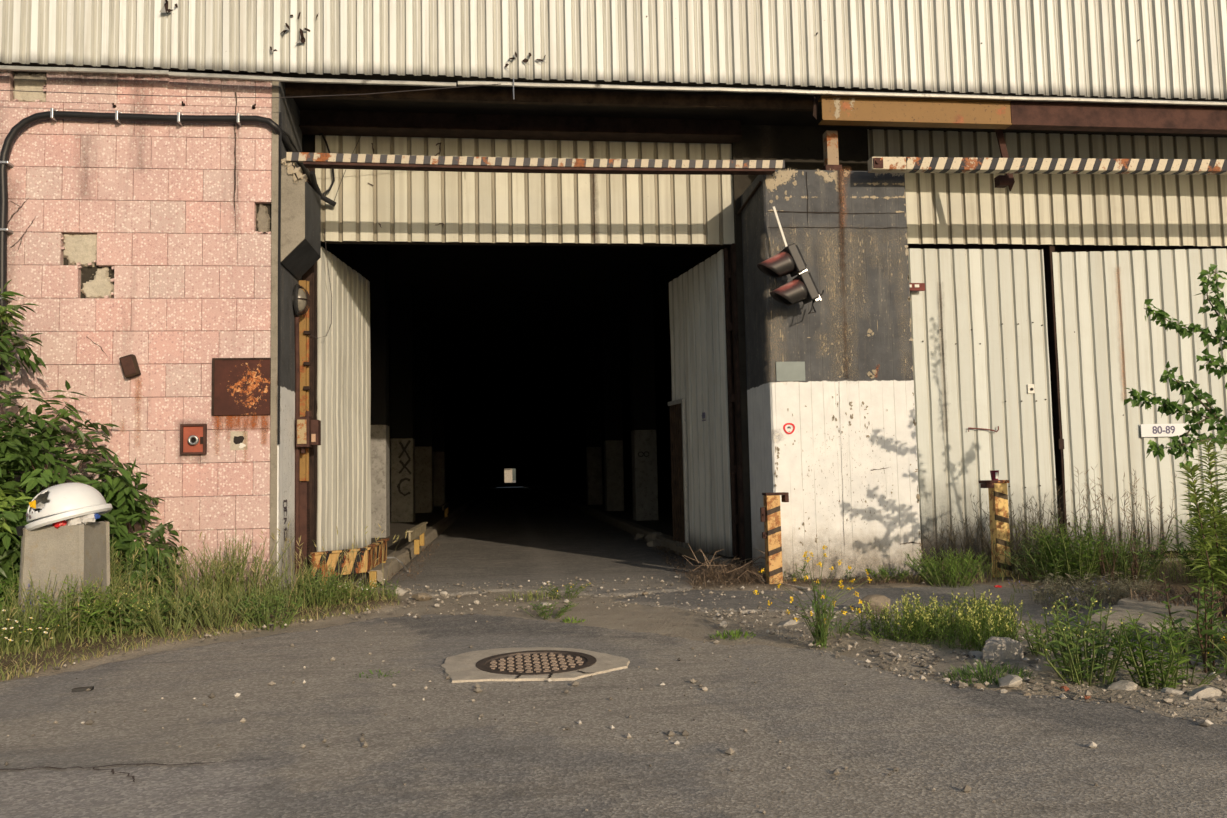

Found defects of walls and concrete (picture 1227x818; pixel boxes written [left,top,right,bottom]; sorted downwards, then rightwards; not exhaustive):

spalling [765,168,907,216]
peeling [254,204,272,234]
peeling [60,234,115,298]
peeling [795,228,877,378]
corrosion [214,415,268,442]
peeling [798,394,896,552]
crack [0,759,264,783]